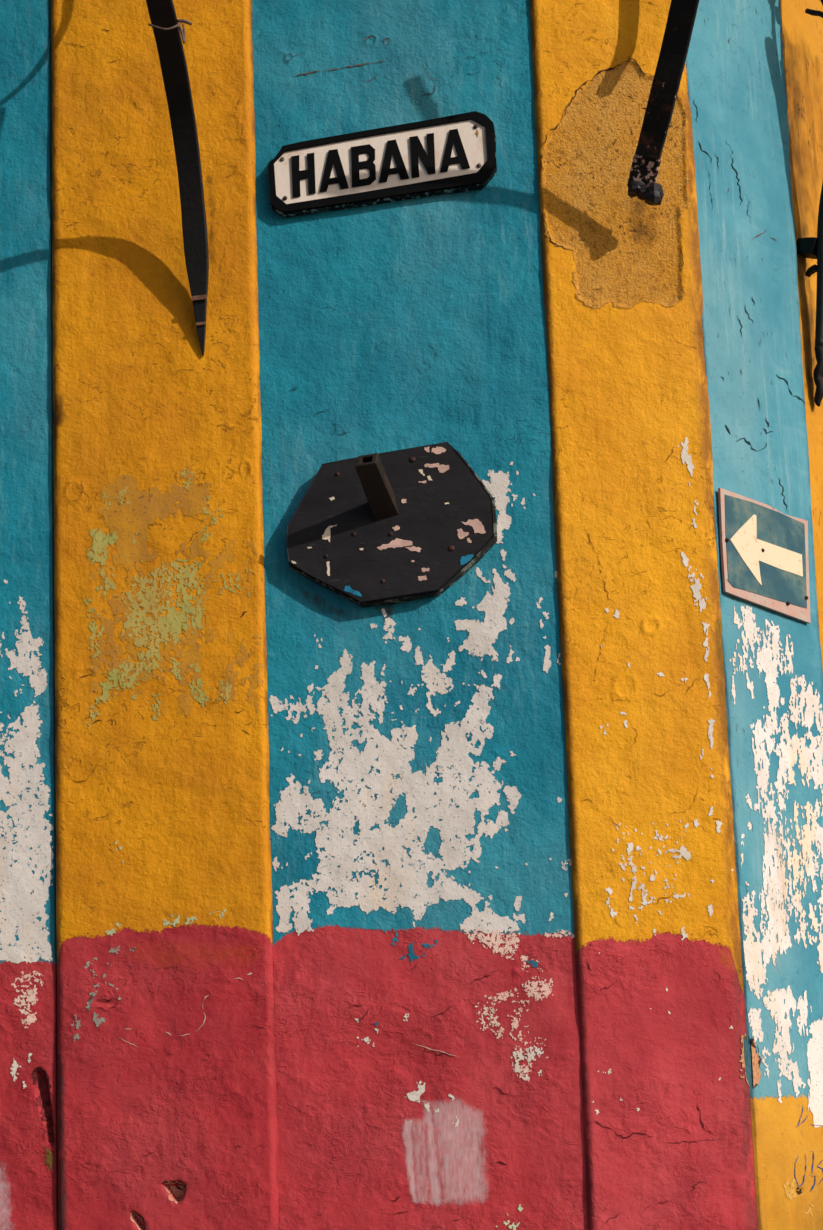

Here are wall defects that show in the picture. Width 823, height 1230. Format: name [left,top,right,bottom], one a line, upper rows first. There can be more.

spalling [539,55,691,309]
peeling [418,447,449,483]
crack [725,399,773,451]
peeling [536,597,561,673]
spalling [681,551,711,697]
peeling [83,462,536,935]
peeling [0,596,54,964]
spalling [605,806,722,923]
peeling [729,606,823,1128]
spalling [10,1053,55,1145]
spalling [407,1081,439,1113]
spalling [513,1046,544,1081]